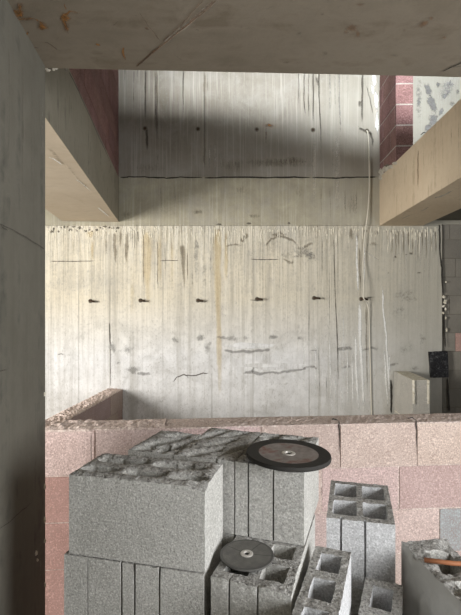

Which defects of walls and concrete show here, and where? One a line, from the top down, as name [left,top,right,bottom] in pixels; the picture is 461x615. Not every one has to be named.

leakage [48,226,437,287]
leakage [329,305,364,407]
leakage [382,291,390,404]